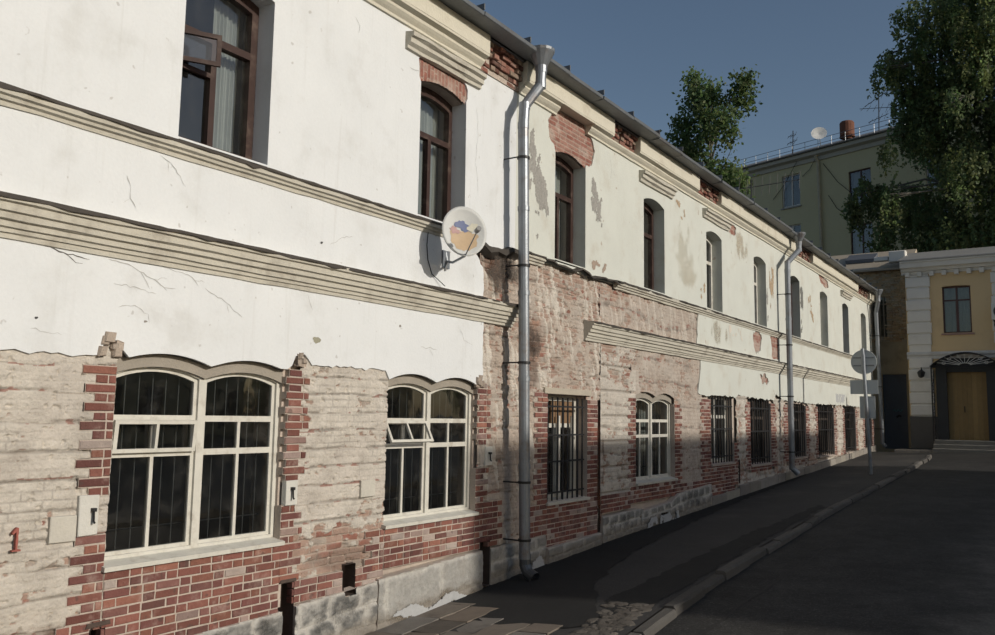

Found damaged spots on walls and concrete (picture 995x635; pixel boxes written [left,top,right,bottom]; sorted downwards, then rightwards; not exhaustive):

flaking render [419,58,467,103]
peeling [529,129,549,217]
flaking render [548,110,593,167]
peeling [591,177,602,227]
crack [110,259,242,319]
flaking render [476,253,702,545]
flaking render [0,344,118,635]
flaking render [292,356,388,579]